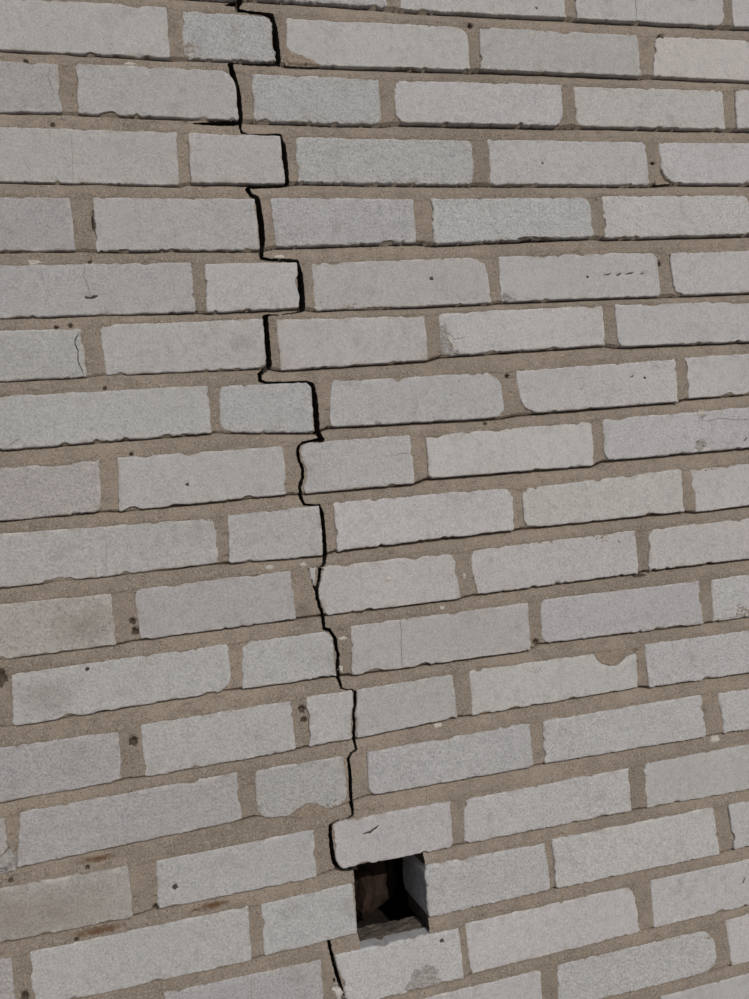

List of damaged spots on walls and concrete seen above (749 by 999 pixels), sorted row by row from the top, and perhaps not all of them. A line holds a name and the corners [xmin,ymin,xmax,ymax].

crack [193,0,358,871]
spalling [350,857,429,941]
crack [327,940,344,994]